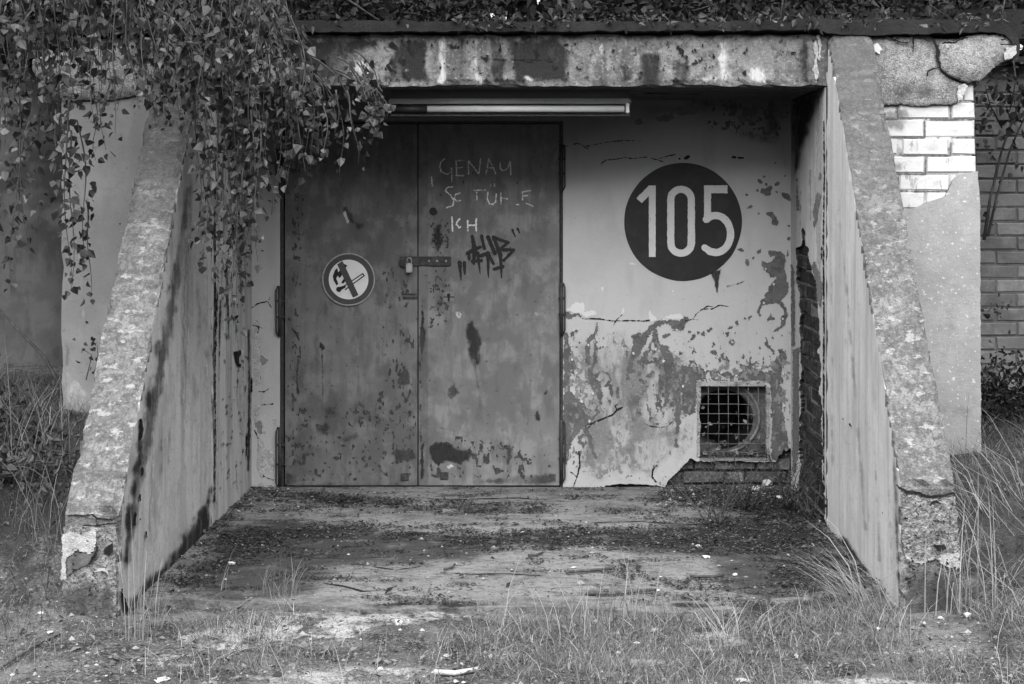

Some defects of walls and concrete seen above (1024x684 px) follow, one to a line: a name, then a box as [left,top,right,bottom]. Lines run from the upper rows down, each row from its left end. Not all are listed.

damp [389,40,446,83]
damp [475,38,566,82]
damp [750,68,765,82]
spalling [884,84,976,208]
crack [580,315,650,324]
crack [685,305,728,321]
spalling [562,172,828,525]
damp [125,189,192,562]
crack [588,404,623,428]
crack [896,485,956,506]
damp [127,427,219,611]
spalling [60,524,128,618]